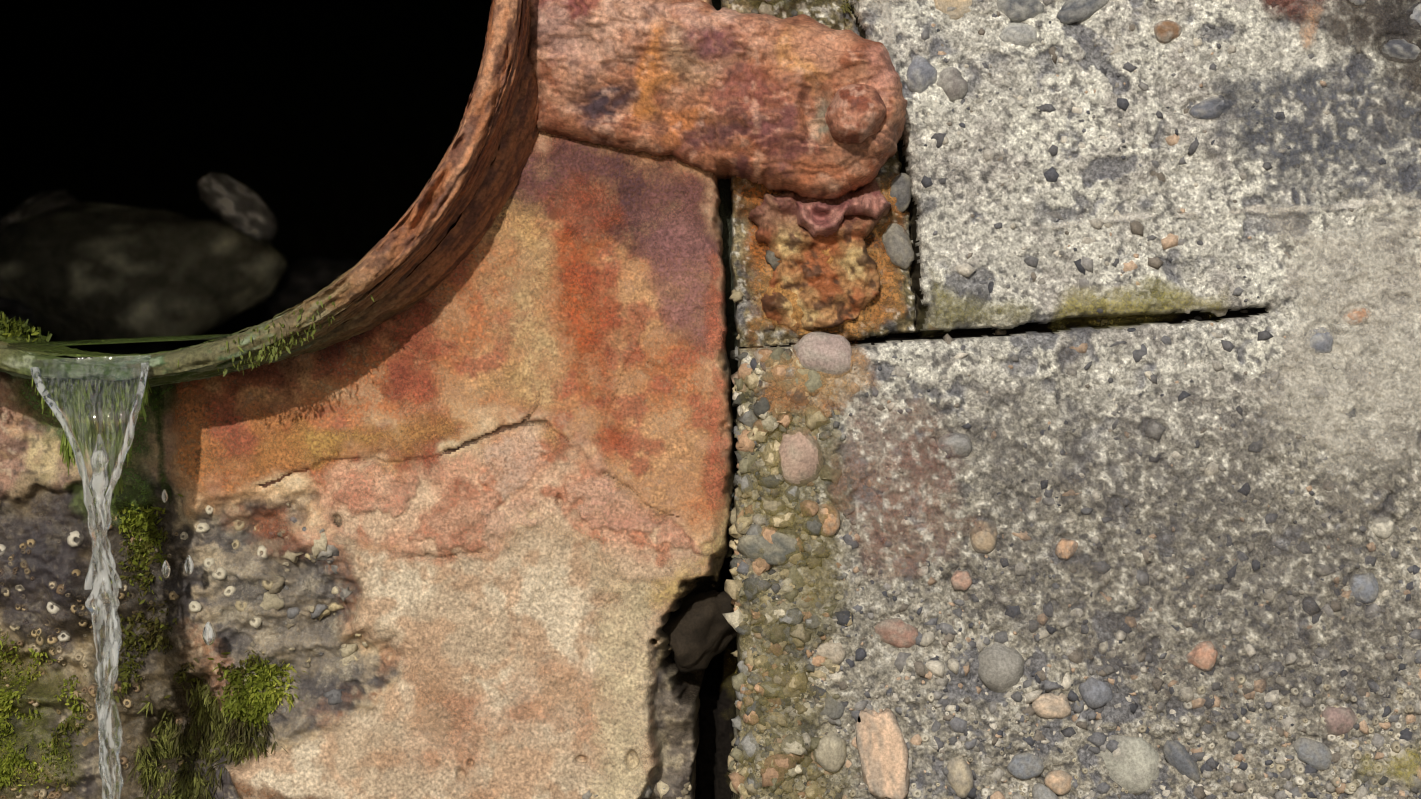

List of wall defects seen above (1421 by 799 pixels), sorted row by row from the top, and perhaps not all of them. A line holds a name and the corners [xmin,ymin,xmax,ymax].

crack [846,0,866,39]
rust [734,176,904,383]
crack [849,140,1269,346]
water stain [1218,0,1421,454]
crack [739,342,796,350]
crack [258,391,569,488]
crack [730,384,738,471]
crack [602,472,680,518]
water stain [0,386,205,799]
crack [432,551,483,560]
crack [720,526,734,592]
crack [695,637,739,799]